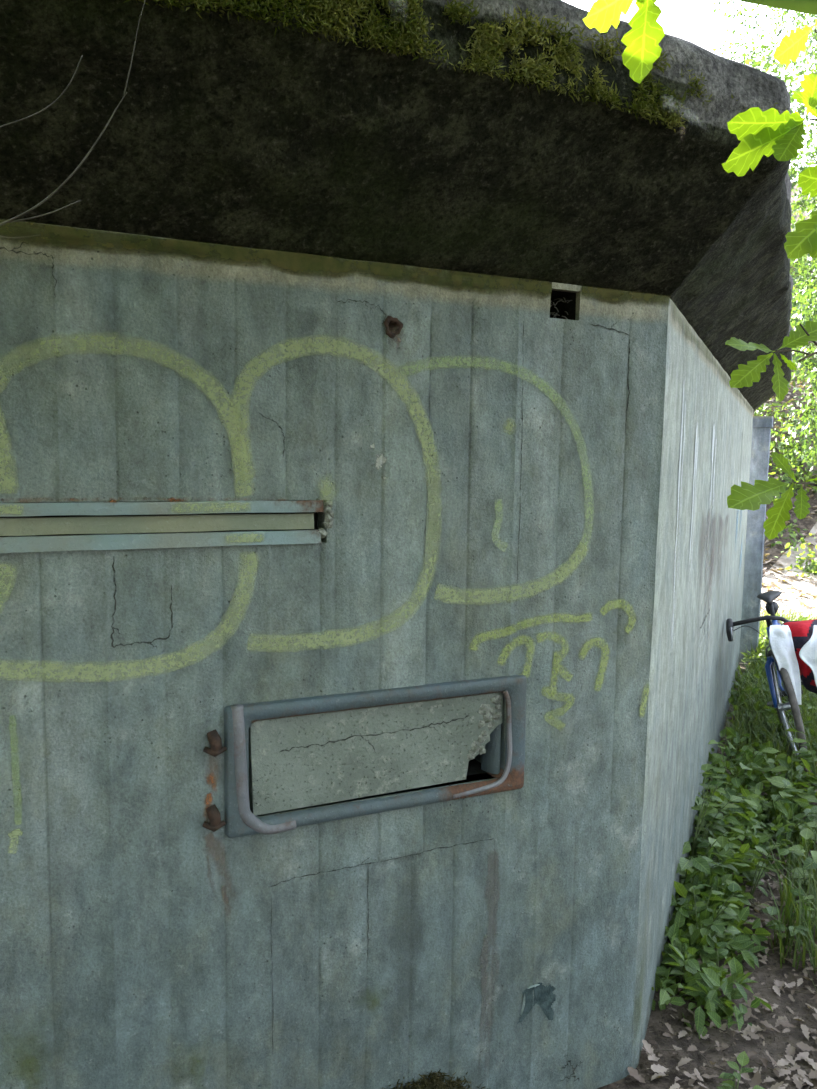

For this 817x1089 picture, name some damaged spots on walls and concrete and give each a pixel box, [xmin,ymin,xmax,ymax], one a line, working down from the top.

crack [110,560,173,648]
crack [280,715,468,753]
spalling [467,695,502,760]
crack [270,838,495,956]